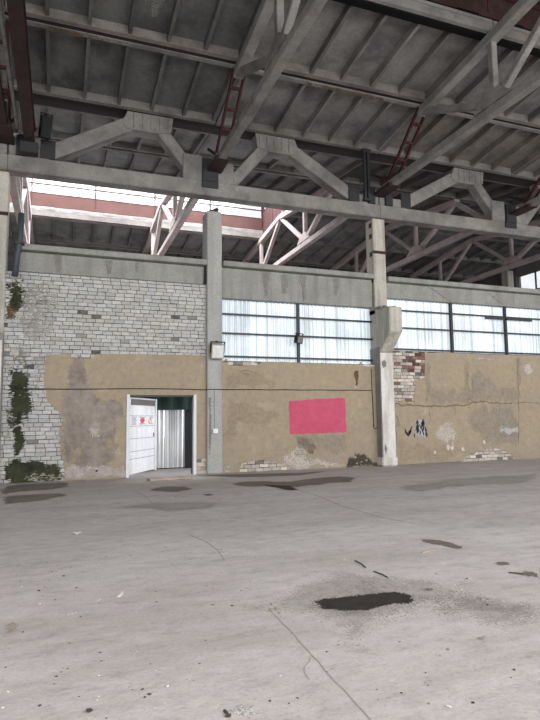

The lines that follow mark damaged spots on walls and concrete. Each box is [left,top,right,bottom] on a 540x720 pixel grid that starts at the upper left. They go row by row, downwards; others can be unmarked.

leakage [59,355,126,467]
spalling [393,351,427,405]
crack [395,357,539,444]
spalling [223,458,289,473]
leakage [205,432,347,490]
spalling [446,440,517,462]
leakage [244,568,540,647]
crack [271,611,371,720]